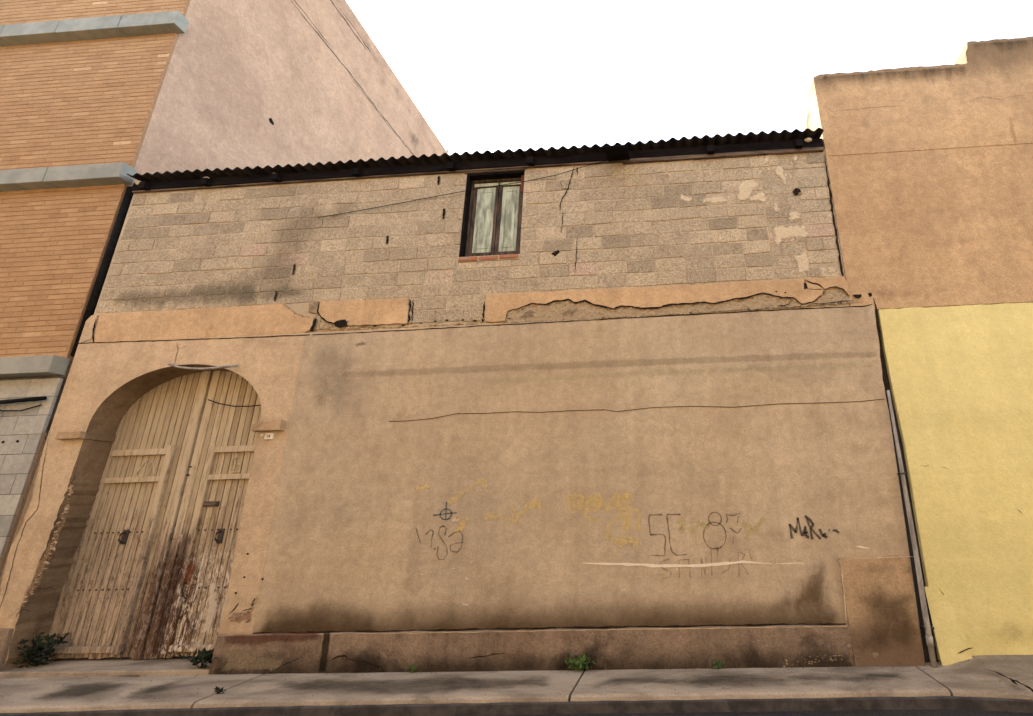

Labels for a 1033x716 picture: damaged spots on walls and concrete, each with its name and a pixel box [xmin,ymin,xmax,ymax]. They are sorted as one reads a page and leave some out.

crack [74,158,890,413]
spalling [274,290,872,332]